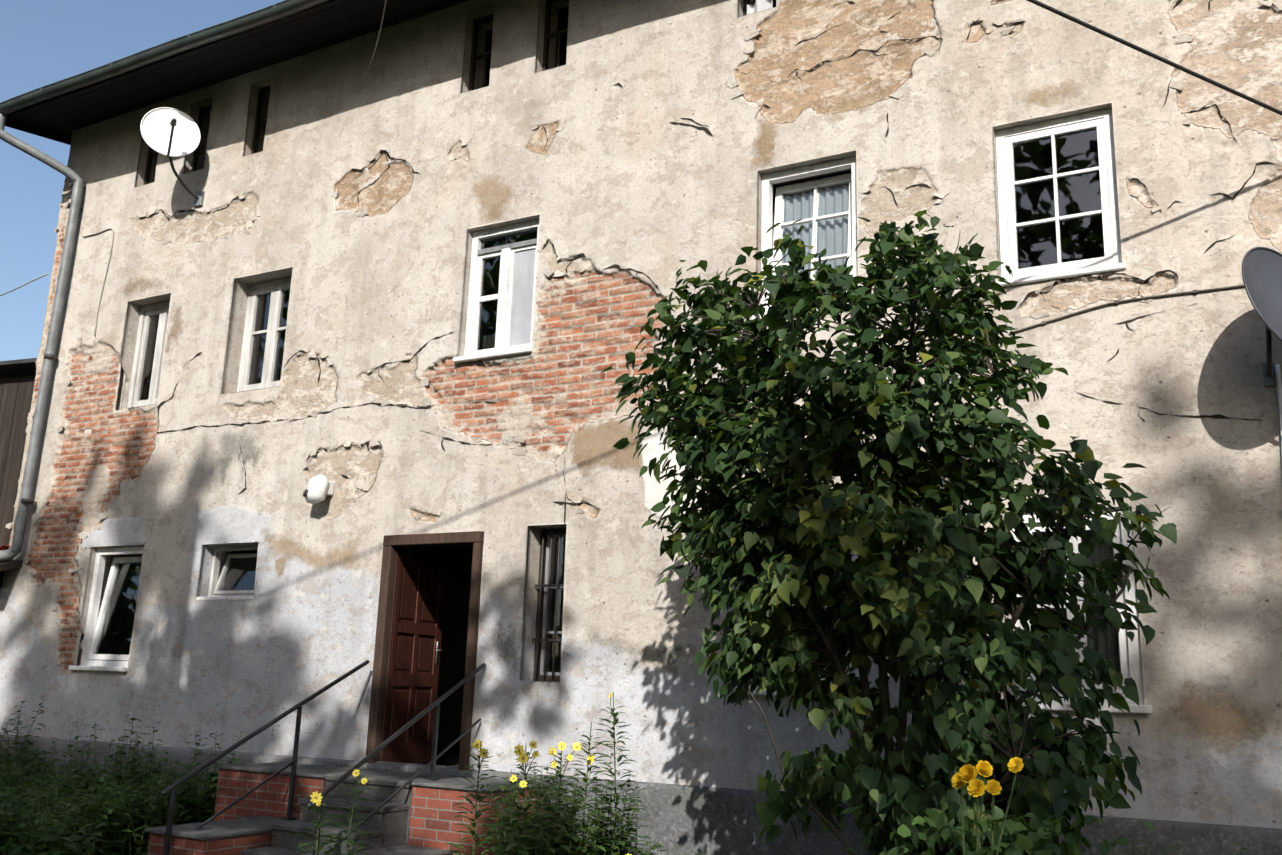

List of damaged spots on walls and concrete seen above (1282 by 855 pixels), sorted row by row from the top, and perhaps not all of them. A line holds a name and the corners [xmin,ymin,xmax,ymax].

flaking render [727,0,942,124]
crack [1158,0,1212,13]
crack [1264,0,1282,11]
flaking render [1167,0,1282,252]
flaking render [130,190,260,246]
flaking render [859,166,951,245]
flaking render [6,180,74,545]
crack [84,328,498,494]
flaking render [356,239,677,462]
crack [1063,388,1257,421]
flaking render [24,338,159,676]
flaking render [301,438,383,520]